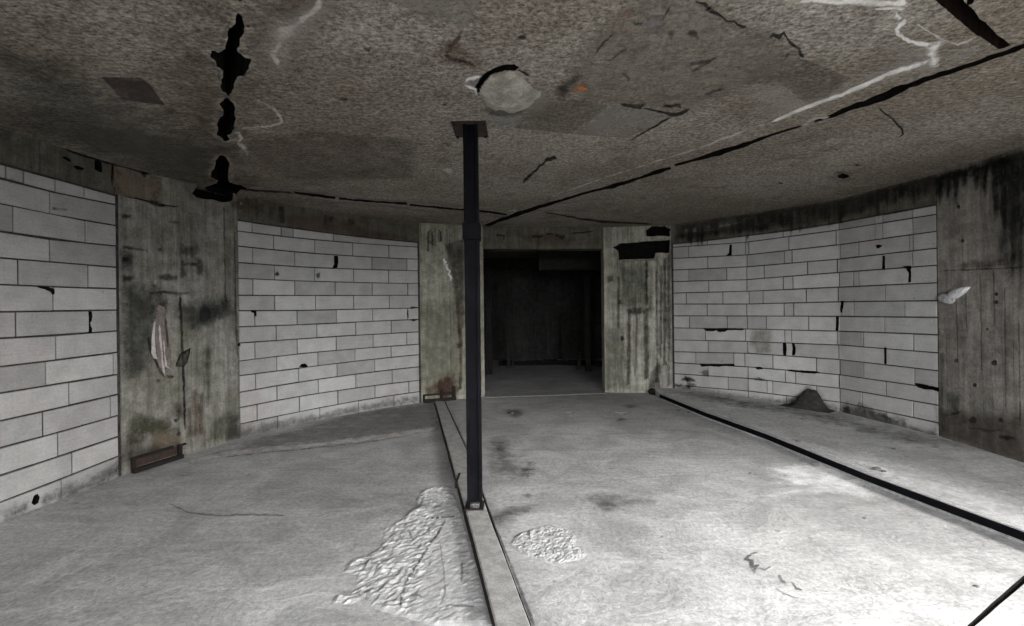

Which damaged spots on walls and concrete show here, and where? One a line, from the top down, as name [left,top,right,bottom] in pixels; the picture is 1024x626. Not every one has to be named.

crack [696,1,747,29]
crack [770,31,804,58]
water stain [551,0,985,198]
crack [242,44,1024,227]
peeling [148,305,190,377]